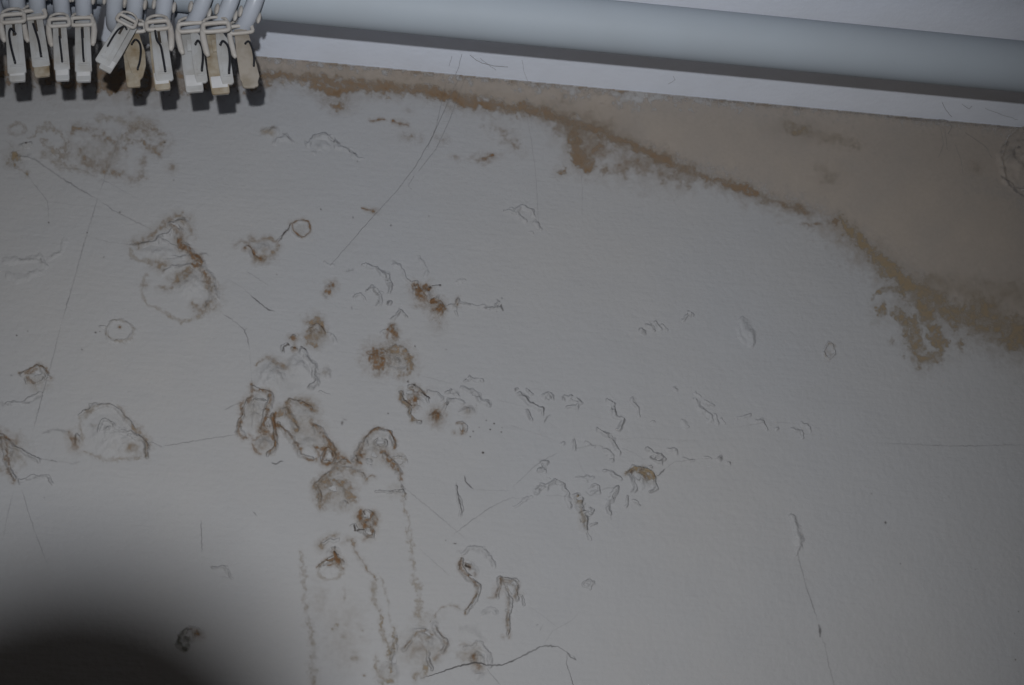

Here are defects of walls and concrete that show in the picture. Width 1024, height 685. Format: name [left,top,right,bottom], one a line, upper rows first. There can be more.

damp [0,55,210,98]
damp [229,57,1024,369]
peeling [352,255,430,321]
peeling [4,364,52,406]
peeling [0,433,55,486]
peeling [511,396,732,541]
crack [787,513,805,557]
peeling [456,545,526,637]
crack [430,661,513,676]